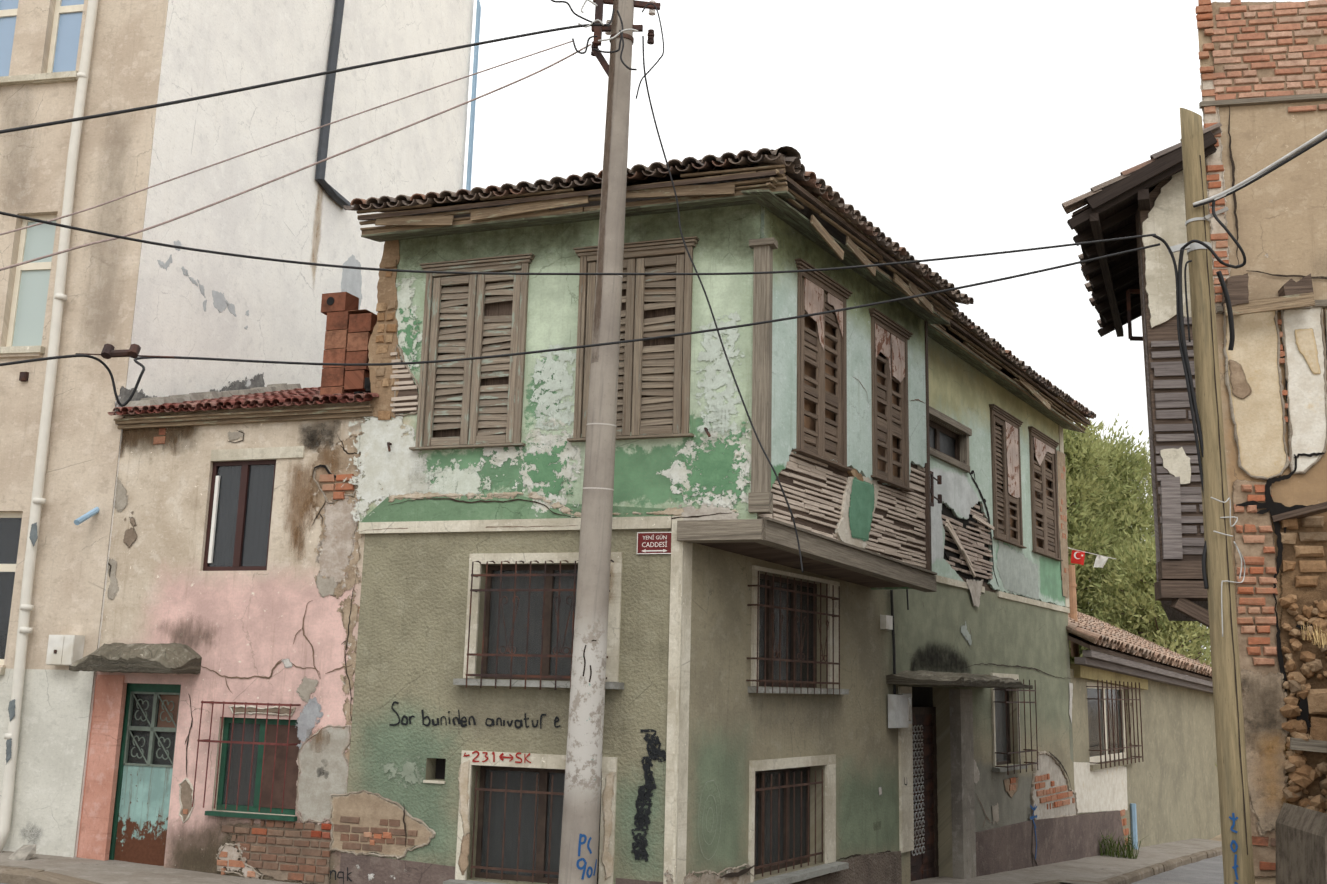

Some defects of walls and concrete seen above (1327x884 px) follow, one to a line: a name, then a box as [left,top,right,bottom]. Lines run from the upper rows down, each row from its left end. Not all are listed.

peeling [158,240,249,329]
peeling [341,254,362,310]
flaking render [1195,0,1327,719]
peeling [613,311,752,520]
flaking render [216,275,582,884]
crack [185,574,357,775]
flaking render [991,751,1078,824]
flaking render [664,860,755,884]
flaking render [1249,796,1276,878]